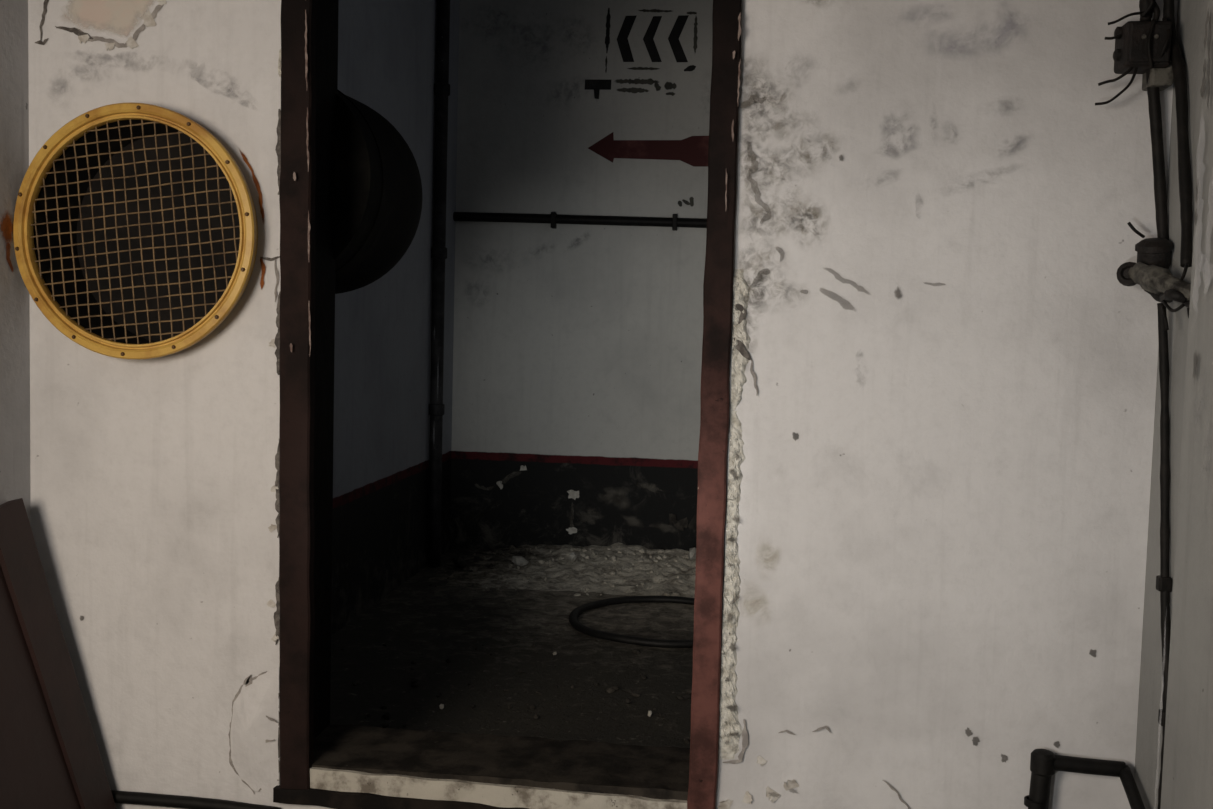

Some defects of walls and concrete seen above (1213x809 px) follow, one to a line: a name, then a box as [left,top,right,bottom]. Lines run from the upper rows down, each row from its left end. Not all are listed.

crack [35,0,49,45]
peeling [55,0,167,51]
corrosion [240,151,264,222]
flaking render [718,269,767,766]
peeling [717,779,799,809]